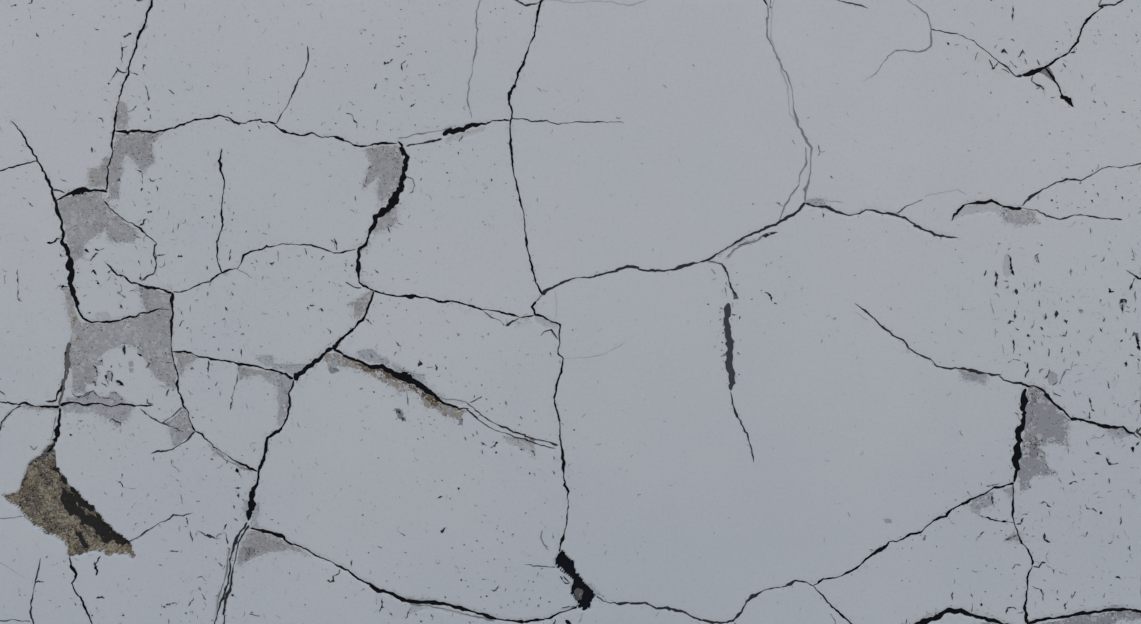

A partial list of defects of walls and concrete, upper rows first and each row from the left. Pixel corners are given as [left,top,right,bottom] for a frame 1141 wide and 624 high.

peeling [58,101,163,260]
peeling [362,146,404,235]
peeling [439,127,485,147]
peeling [0,286,176,436]
crack [0,509,135,624]
spalling [2,445,135,574]